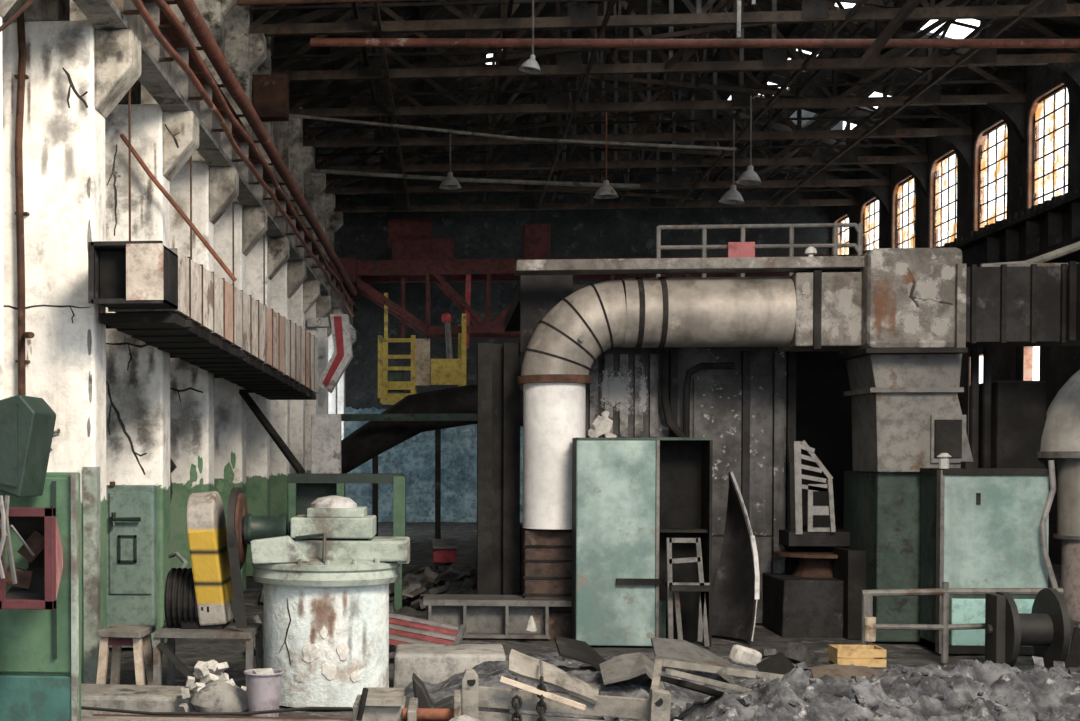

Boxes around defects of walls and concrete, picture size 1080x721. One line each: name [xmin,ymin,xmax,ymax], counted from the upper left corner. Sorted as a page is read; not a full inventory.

leakage [44,51,65,101]
crack [62,67,88,108]
crack [106,343,149,475]
peeling [588,411,617,438]